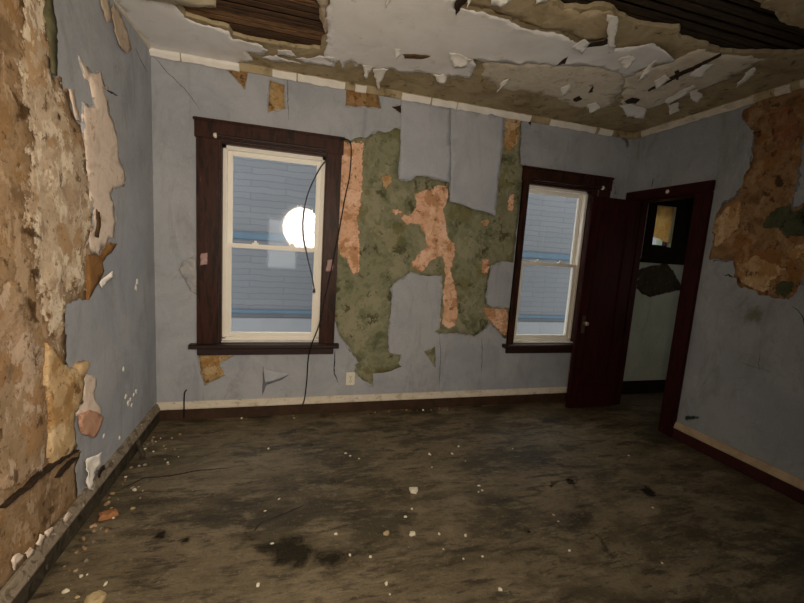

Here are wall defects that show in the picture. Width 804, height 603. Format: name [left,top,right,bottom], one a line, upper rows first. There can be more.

flaking render [0,0,127,590]
flaking render [338,141,364,274]
flaking render [392,185,458,328]
peeling [100,0,804,119]
flaking render [484,308,508,335]
flaking render [504,119,521,151]
crack [648,54,721,91]
flaking render [709,88,804,300]